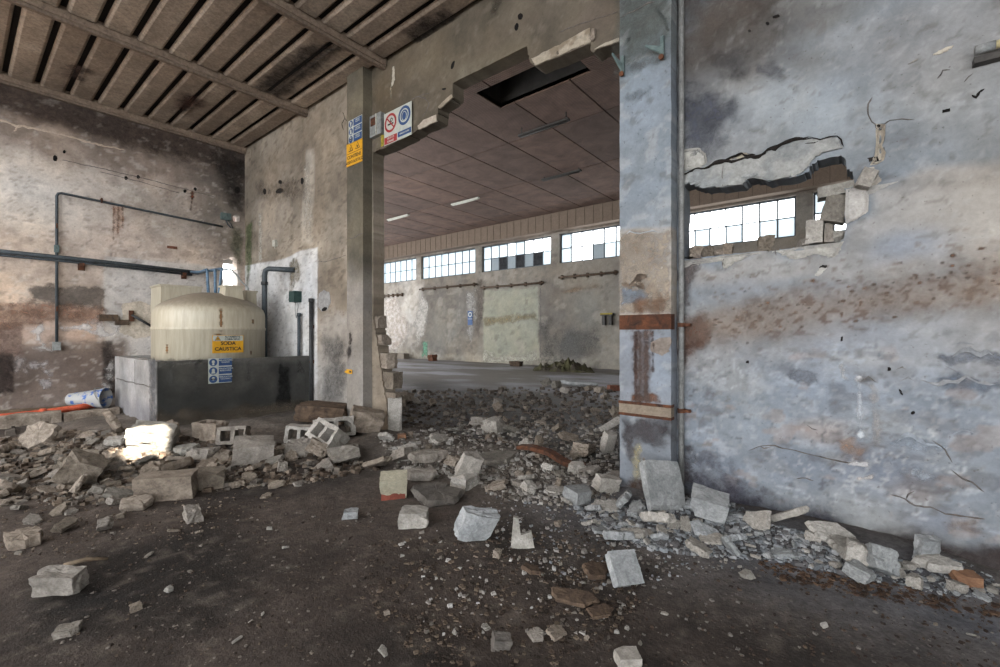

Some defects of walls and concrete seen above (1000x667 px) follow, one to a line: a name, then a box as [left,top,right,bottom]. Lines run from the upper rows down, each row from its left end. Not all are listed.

spalling [531,28,619,65]
damp [256,44,343,97]
spalling [412,94,454,133]
spalling [678,137,843,189]
spalling [684,241,844,276]
corrosion [618,330,674,421]
crack [751,445,849,481]
crack [932,440,984,492]
crack [890,491,983,519]